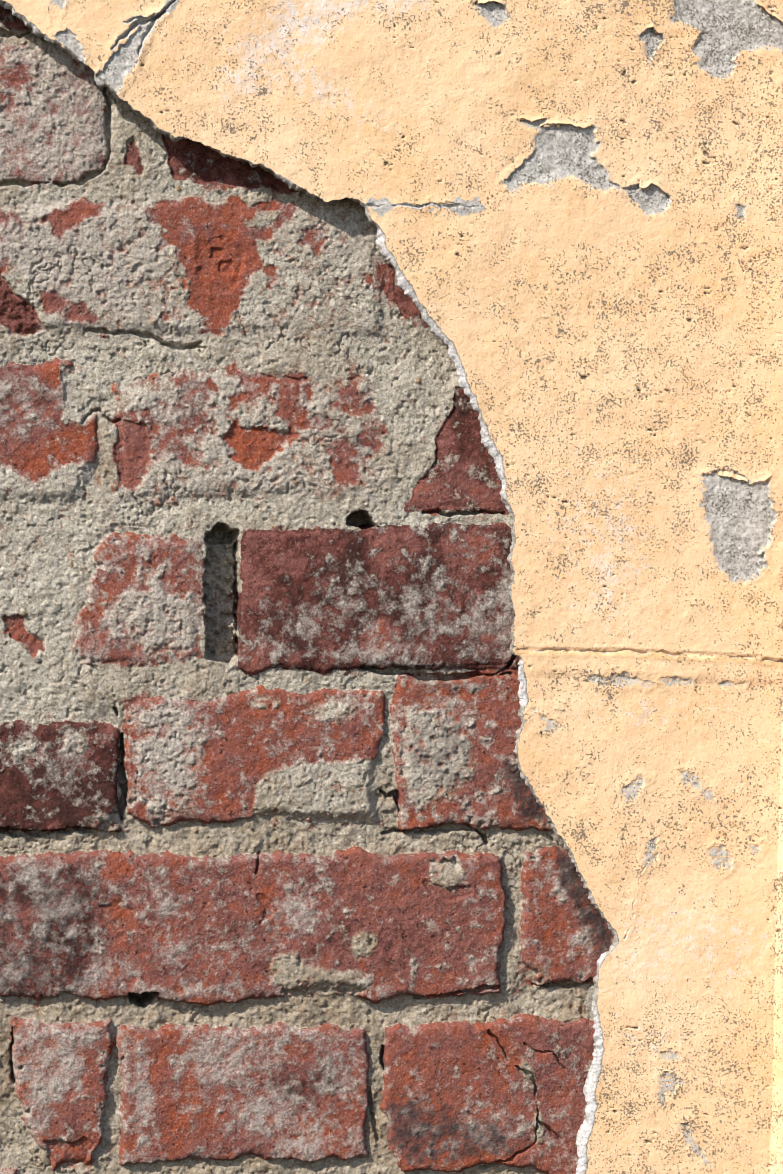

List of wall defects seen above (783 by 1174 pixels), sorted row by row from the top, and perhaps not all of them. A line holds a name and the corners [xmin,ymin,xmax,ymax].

crack [110,0,178,57]
peeling [639,0,783,79]
peeling [504,114,672,215]
peeling [700,466,779,583]
flaking render [0,0,619,1174]
crack [479,1029,567,1170]